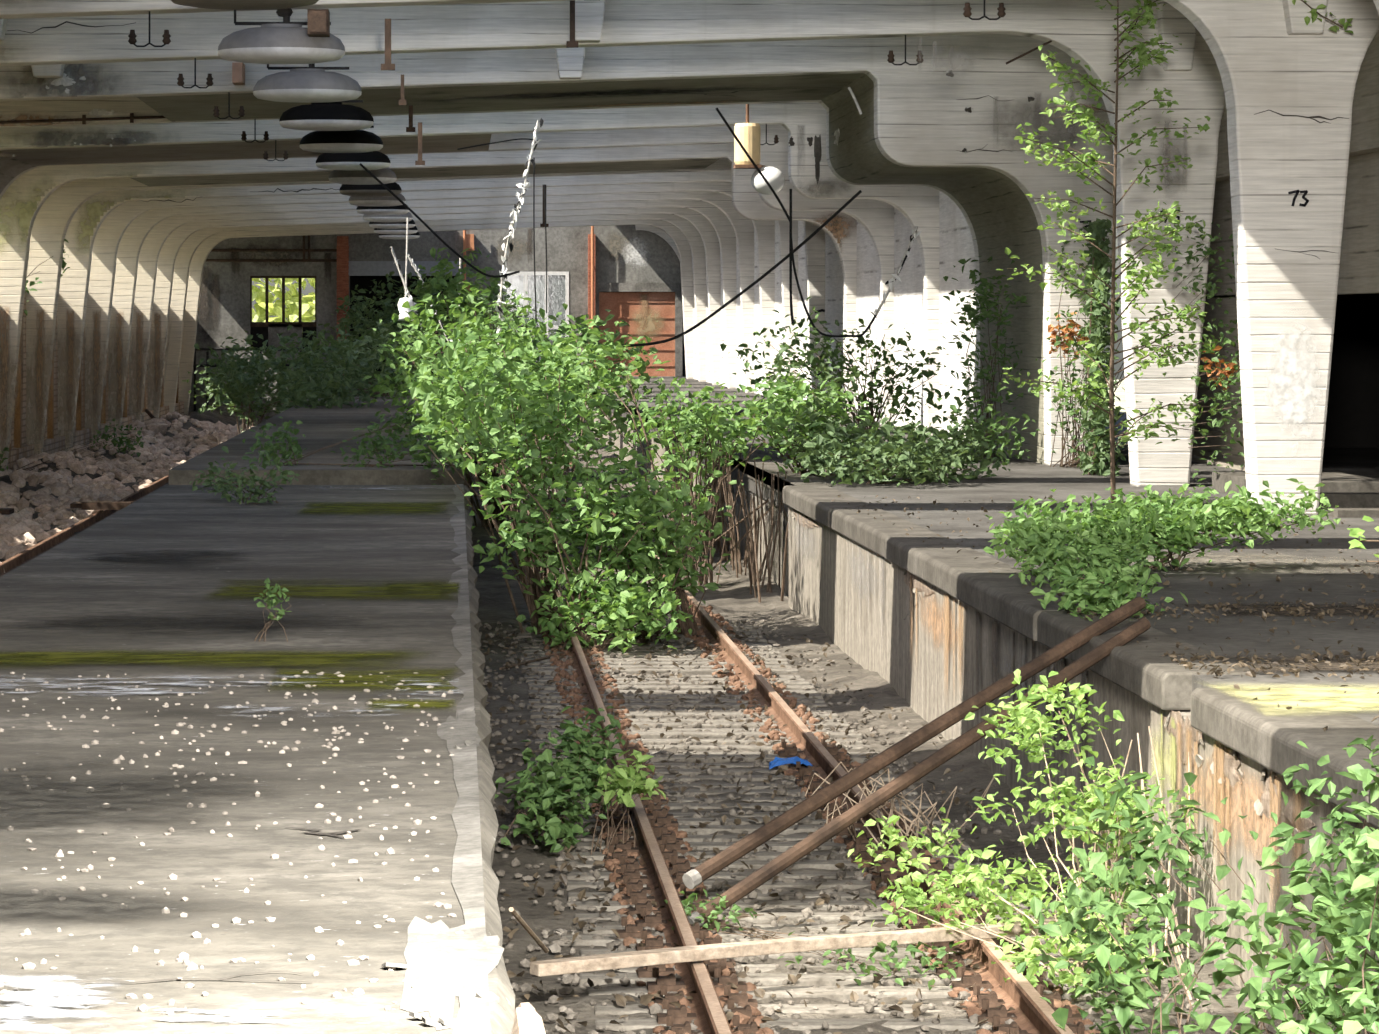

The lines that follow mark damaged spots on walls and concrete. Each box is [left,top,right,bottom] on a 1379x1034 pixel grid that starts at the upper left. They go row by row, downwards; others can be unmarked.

crack [1254,110,1349,124]
spalling [382,916,504,1030]